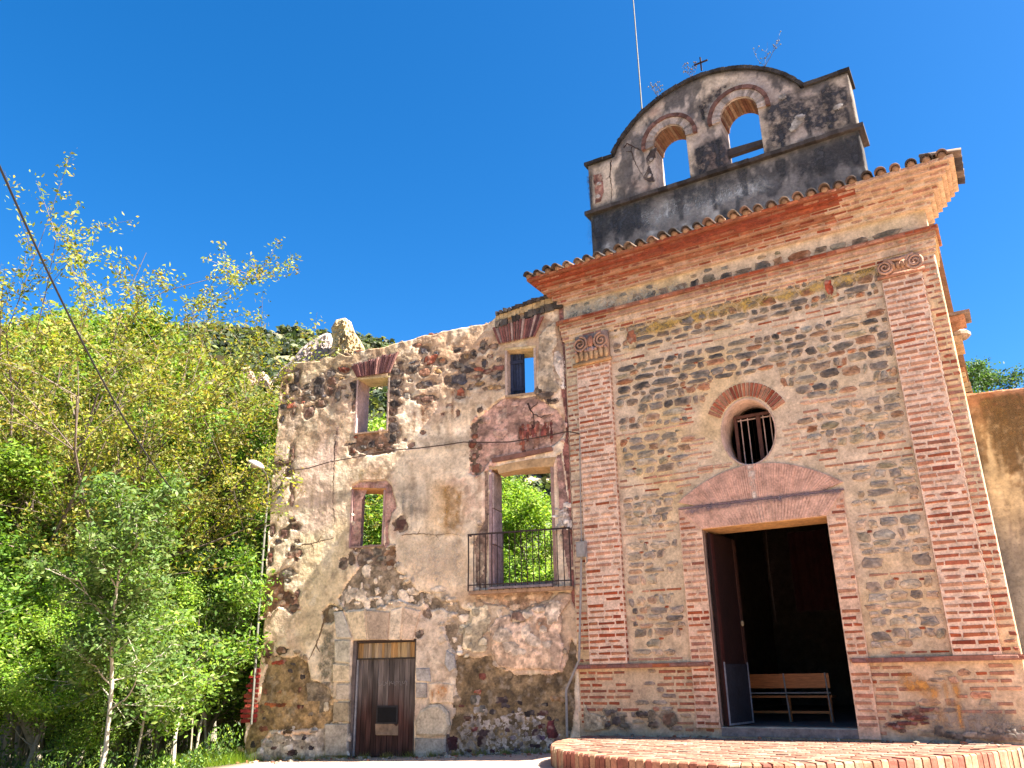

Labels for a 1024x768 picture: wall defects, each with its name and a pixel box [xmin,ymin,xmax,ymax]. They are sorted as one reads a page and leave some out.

crack [609,143,642,198]
leakage [587,140,757,249]
mould [764,84,859,182]
spalling [279,365,360,423]
flaking render [323,308,577,755]
flaking render [238,642,338,759]